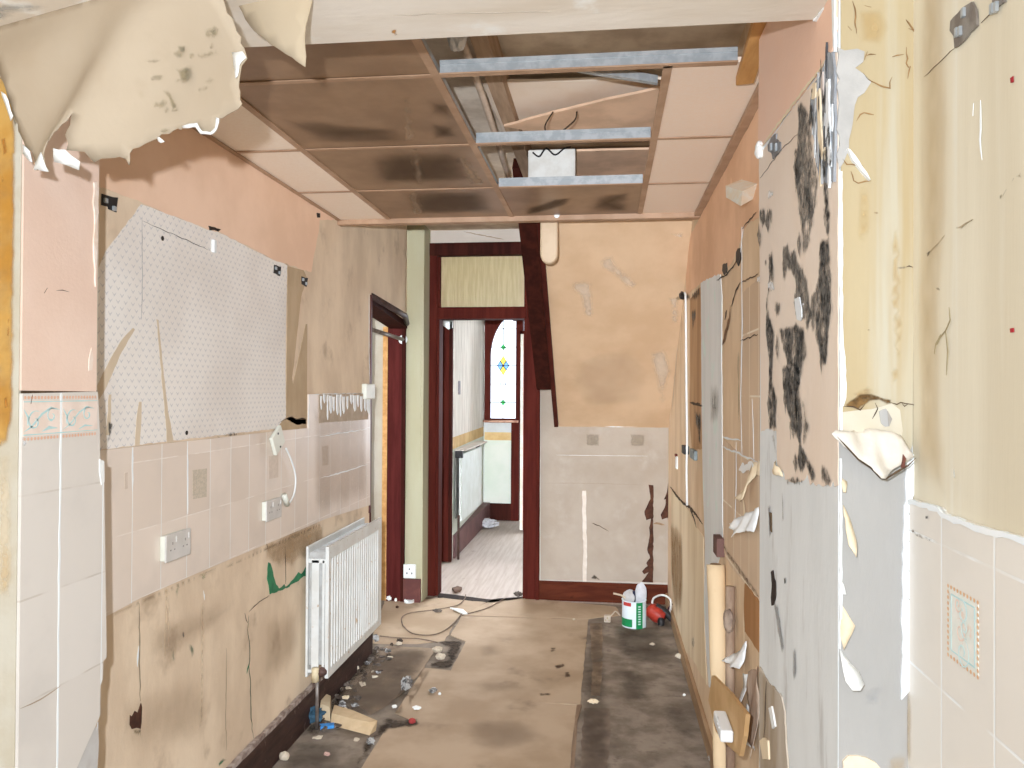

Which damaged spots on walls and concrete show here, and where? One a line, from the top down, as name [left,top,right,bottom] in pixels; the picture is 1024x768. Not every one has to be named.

flaking render [809,0,871,188]
damp [425,196,475,210]
damp [757,209,772,246]
damp [765,103,831,484]
peeling [273,265,308,430]
crack [934,309,951,375]
flaking render [842,403,903,436]
flaking render [642,485,668,583]
crack [670,487,702,526]
flaking render [129,703,142,732]